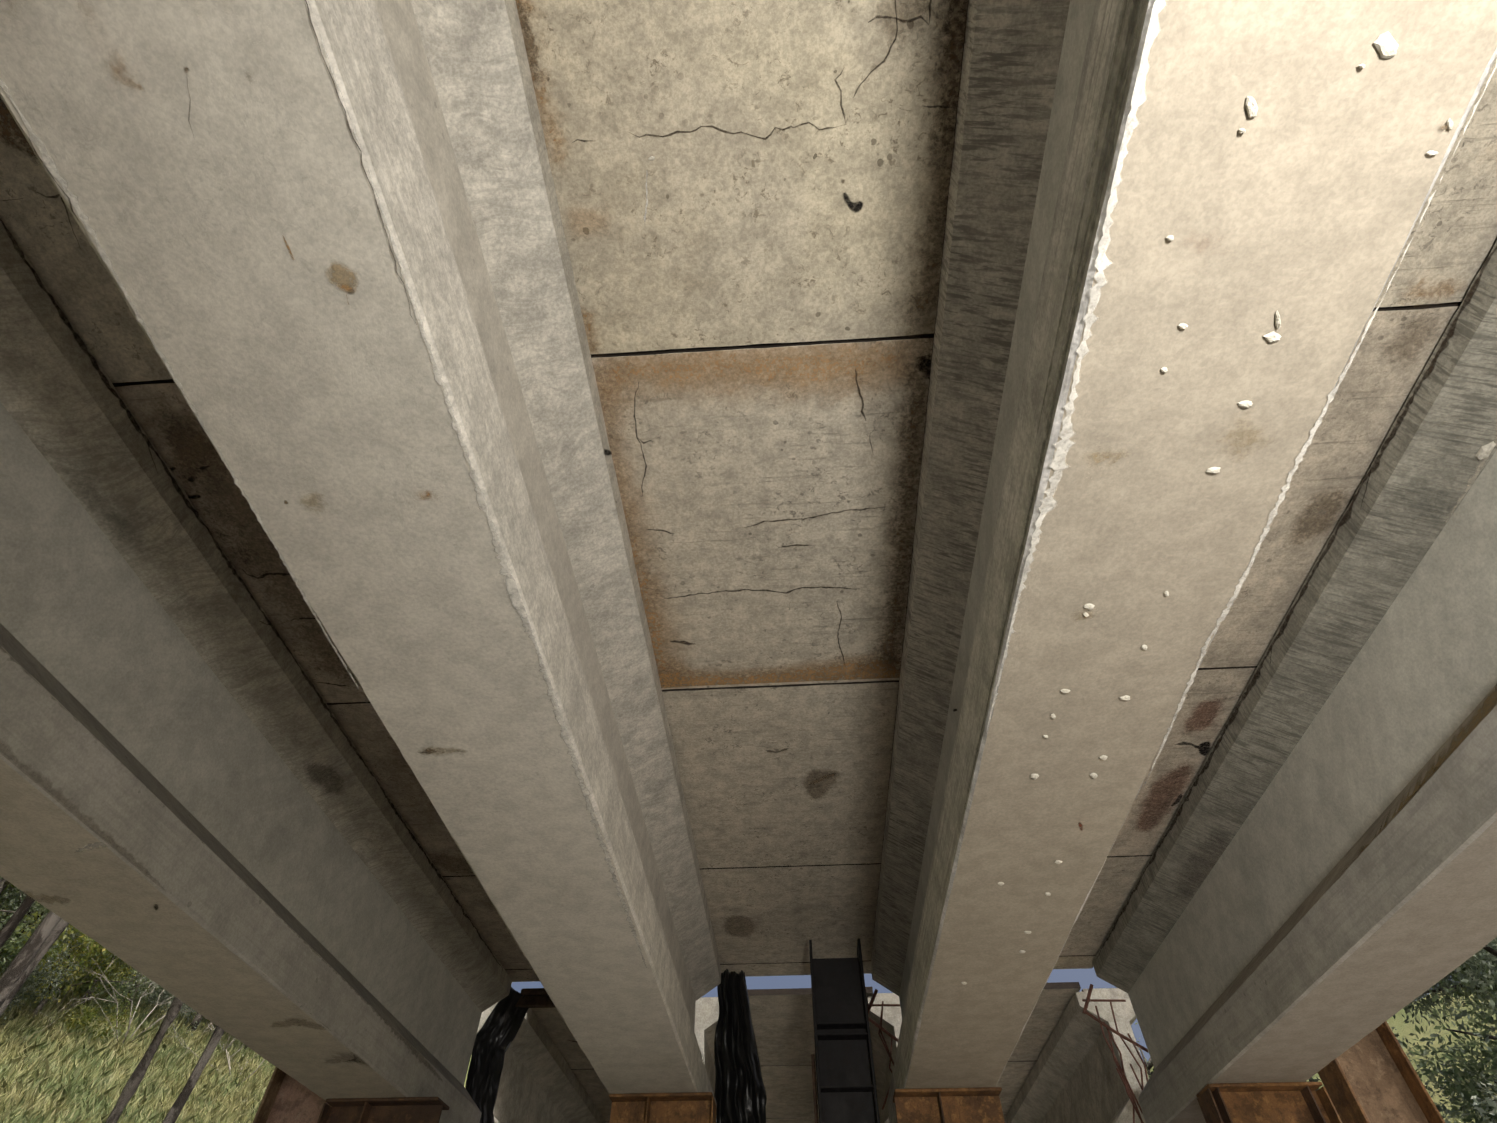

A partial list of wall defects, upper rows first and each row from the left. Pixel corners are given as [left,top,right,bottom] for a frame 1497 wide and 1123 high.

leakage [0,97,37,158]
corrosion [515,0,561,144]
corrosion [583,314,910,391]
crack [629,0,969,956]
crack [0,192,502,967]
leakage [169,420,356,682]
corrosion [618,474,900,688]
corrosion [1186,701,1220,731]
corrosion [1138,767,1192,831]